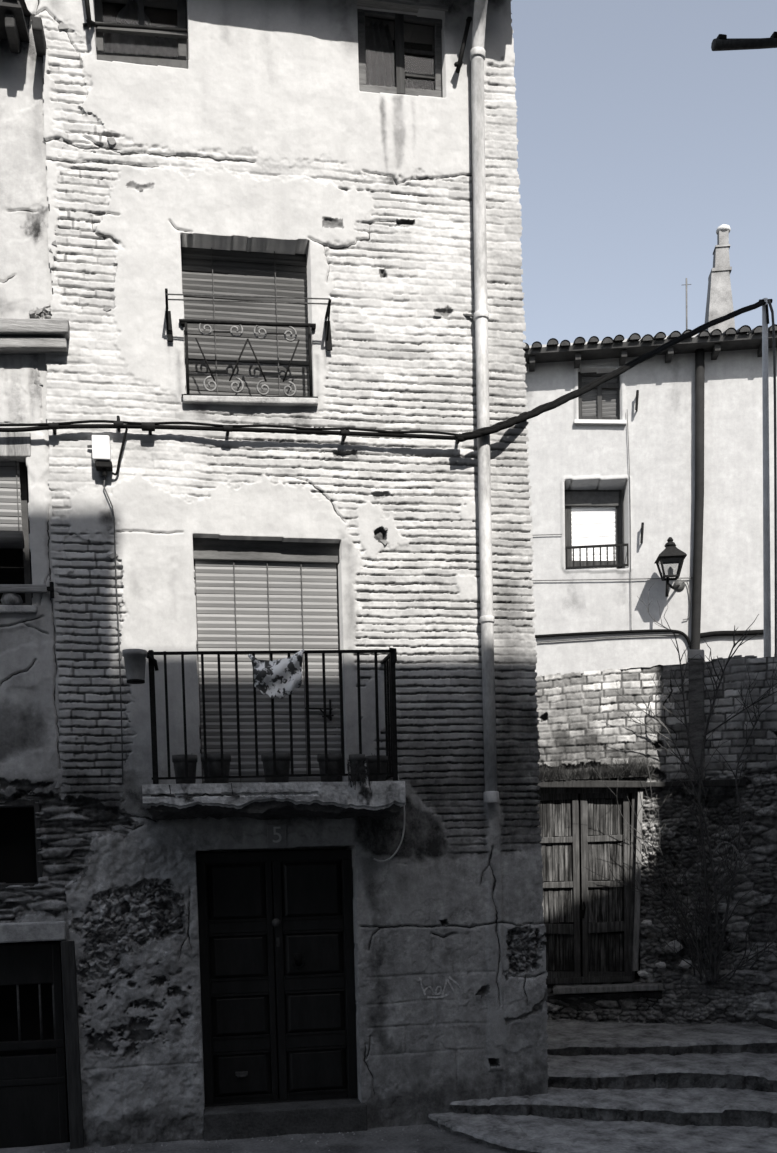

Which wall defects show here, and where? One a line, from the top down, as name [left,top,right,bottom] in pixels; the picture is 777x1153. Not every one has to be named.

peeling [45,19,118,311]
spalling [126,180,155,191]
spalling [322,216,345,229]
spalling [29,304,52,319]
spalling [433,305,455,319]
spalling [371,490,392,499]
crack [0,510,60,762]
peeling [0,532,199,1065]
leakage [354,786,446,859]
crack [360,850,544,1004]
spalling [502,923,547,980]
crack [364,1044,375,1094]